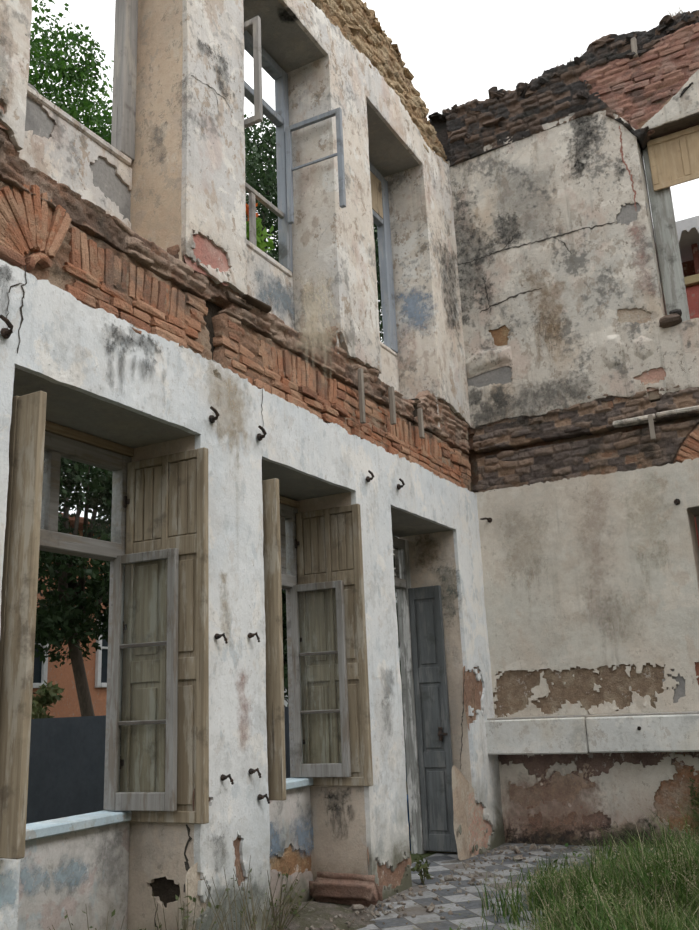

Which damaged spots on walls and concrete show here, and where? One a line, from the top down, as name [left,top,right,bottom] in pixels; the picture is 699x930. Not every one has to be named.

flaking render [25,83,54,139]
flaking render [89,156,131,221]
crack [619,126,637,208]
crack [460,221,617,313]
crack [6,265,27,353]
damp [107,324,161,374]
flaking render [463,662,699,731]
flaking render [452,765,492,860]
flaking render [498,752,699,840]
crack [184,824,192,892]
flaking render [233,831,246,886]
peeling [150,862,213,930]